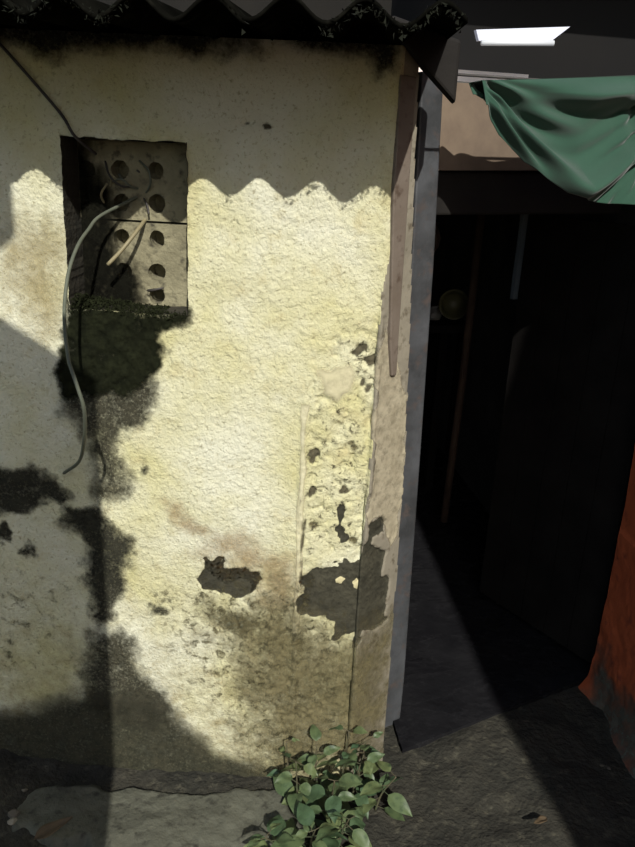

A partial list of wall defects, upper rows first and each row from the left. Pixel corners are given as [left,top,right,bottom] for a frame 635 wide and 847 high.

spalling [196,556,261,598]
spalling [296,330,408,648]